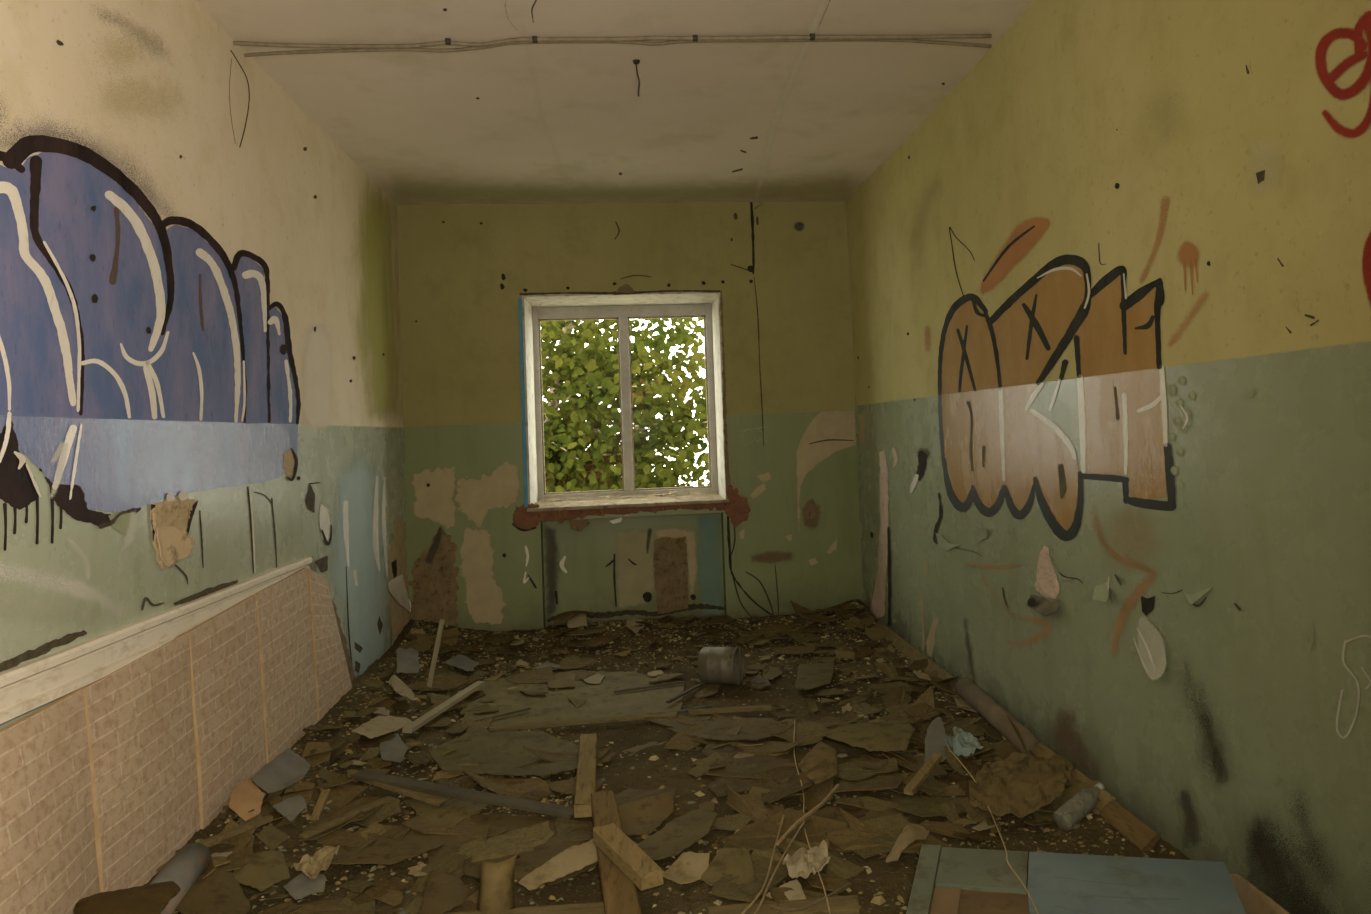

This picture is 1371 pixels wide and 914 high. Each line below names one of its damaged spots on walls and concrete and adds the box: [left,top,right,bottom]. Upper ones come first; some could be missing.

spalling [98,491,198,569]
spalling [410,461,772,625]
peeling [785,410,865,541]
peeling [870,448,897,626]
peeling [910,448,929,493]
peeling [1026,546,1121,616]